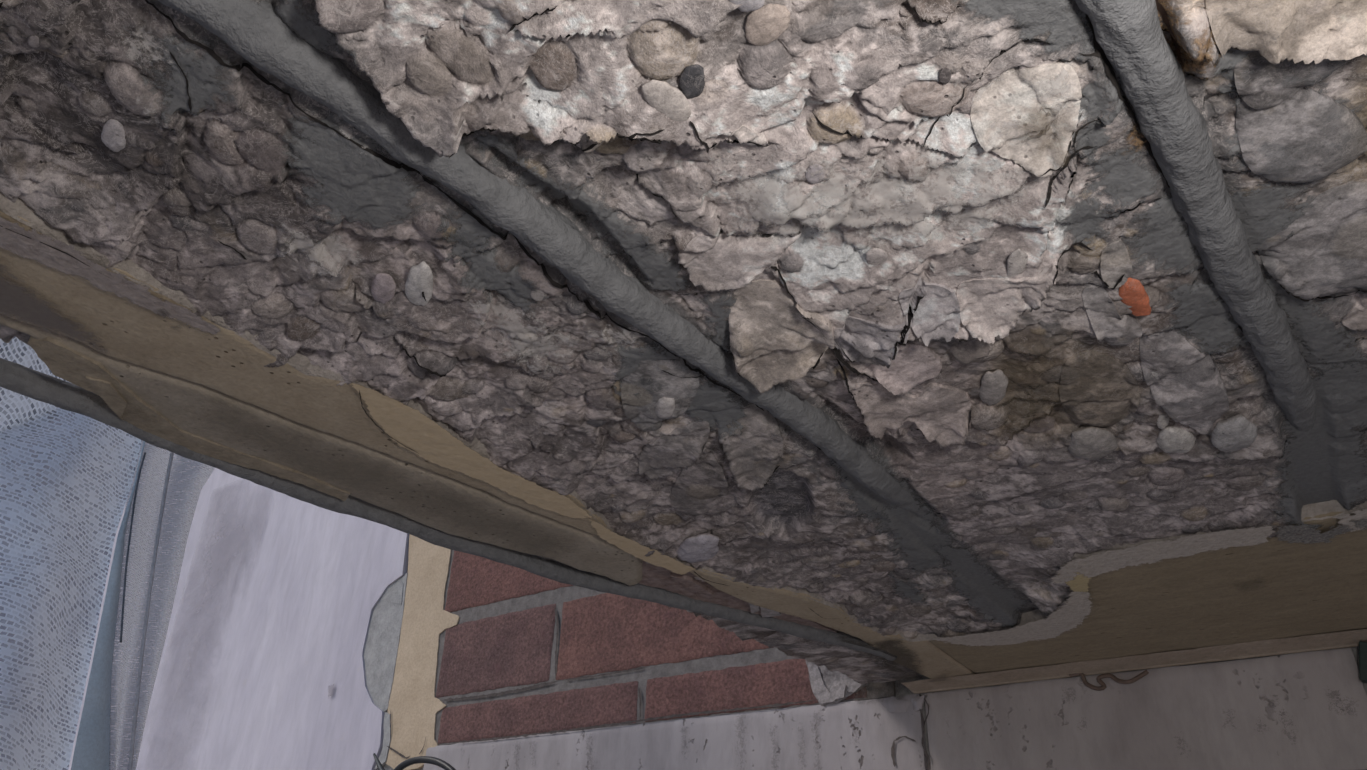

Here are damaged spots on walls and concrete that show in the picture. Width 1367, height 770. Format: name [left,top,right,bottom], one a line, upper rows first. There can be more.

spalling [0,324,896,706]
crack [145,0,773,412]
spalling [0,0,1297,647]
crack [757,223,924,426]
crack [1053,239,1125,290]
spalling [1064,0,1367,432]
spalling [1301,488,1367,532]